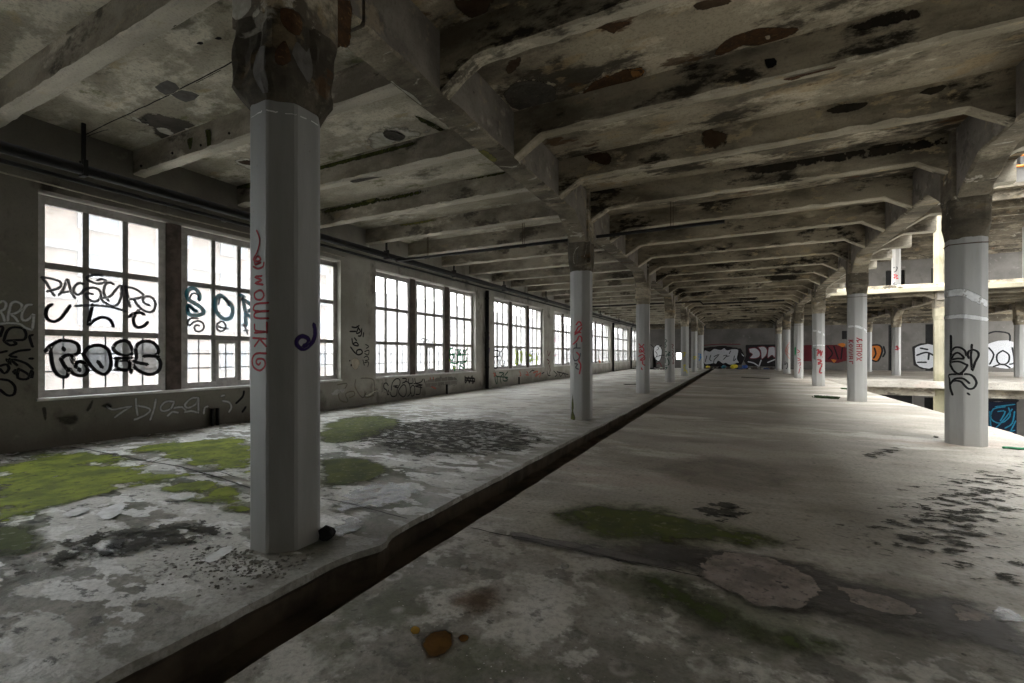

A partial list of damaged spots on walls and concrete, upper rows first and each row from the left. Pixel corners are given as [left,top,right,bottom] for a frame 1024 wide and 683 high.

peeling [232,0,251,20]
spalling [253,8,313,93]
corrosion [715,27,799,56]
spalling [368,127,429,148]
corrosion [702,129,727,149]